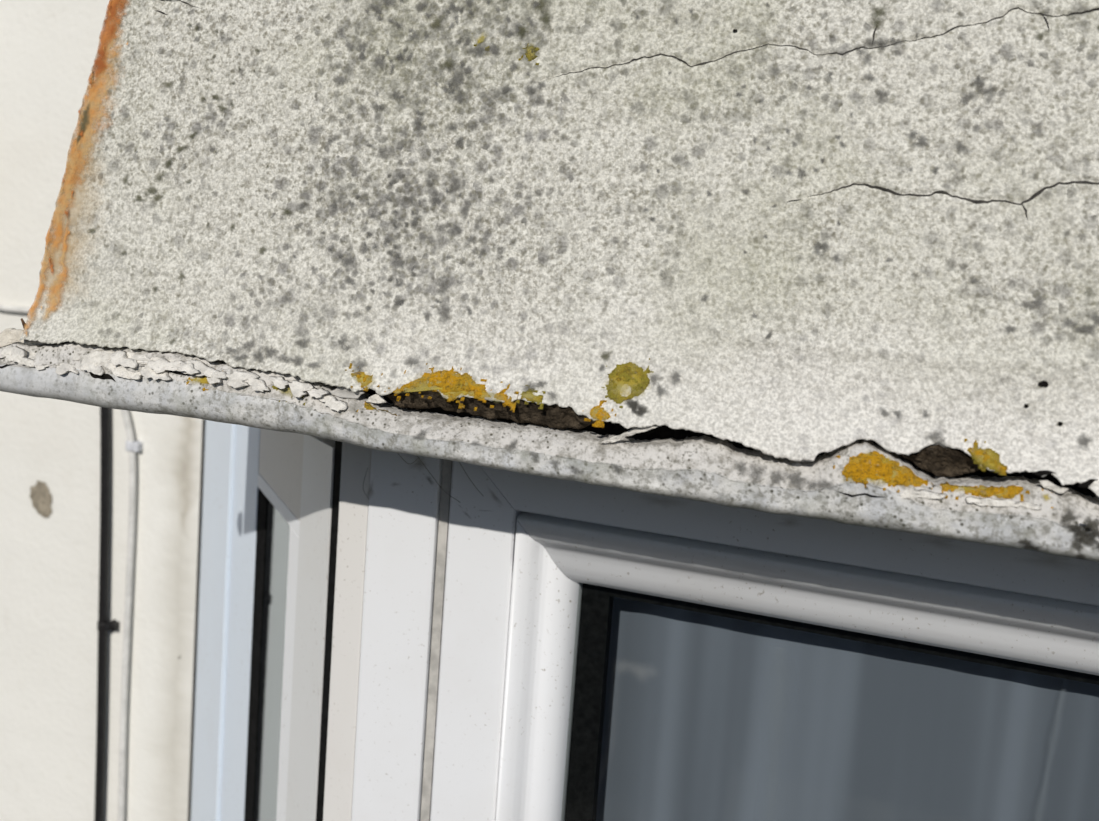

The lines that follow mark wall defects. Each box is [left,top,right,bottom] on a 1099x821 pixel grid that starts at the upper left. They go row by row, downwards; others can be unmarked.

mould [338,0,472,72]
mould [487,0,550,55]
crack [534,7,1099,83]
corrosion [25,0,128,335]
leakage [136,133,195,201]
crack [788,181,1099,219]
mould [331,195,416,286]
flaking render [0,328,596,429]
crack [363,388,757,451]
flaking render [600,426,658,443]
crack [836,489,887,497]
crack [870,440,1097,498]